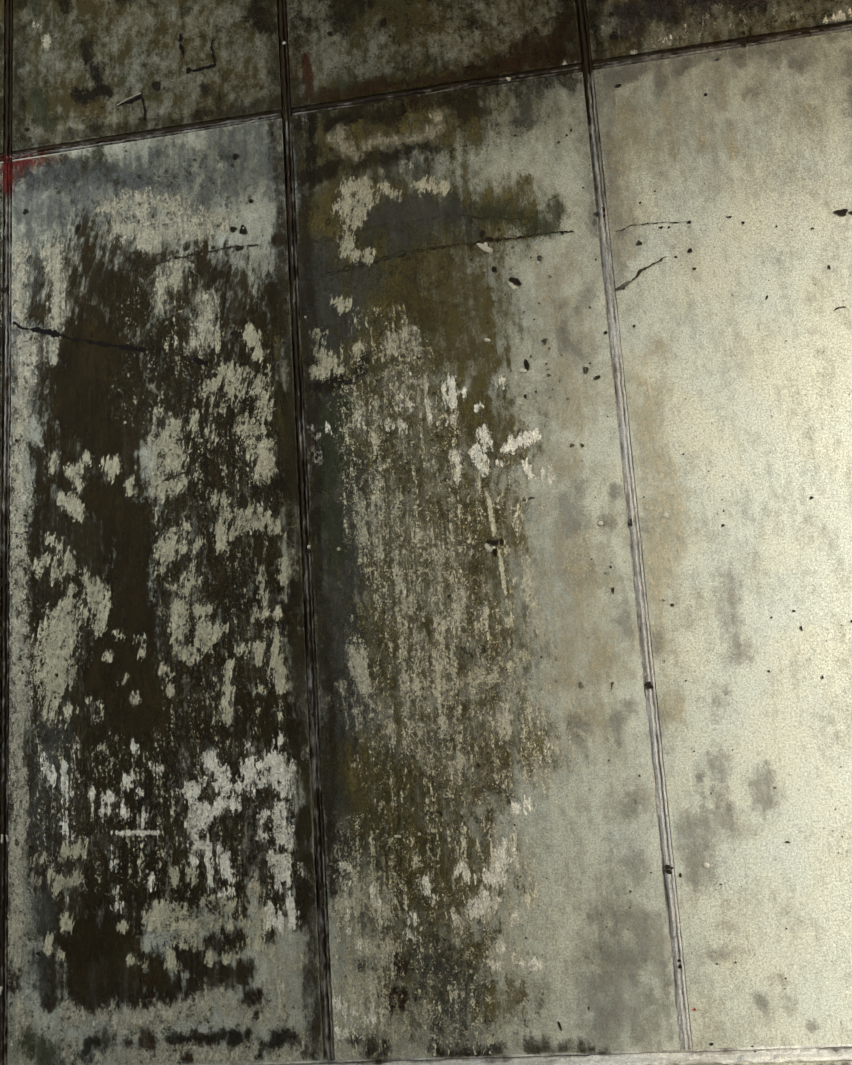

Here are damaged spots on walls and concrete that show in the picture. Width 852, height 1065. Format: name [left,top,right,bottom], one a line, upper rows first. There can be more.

water stain [588,0,847,74]
crack [304,214,574,280]
crack [615,256,666,290]
crack [615,221,690,232]
crack [13,321,149,352]
water stain [0,0,631,1065]
water stain [677,752,736,888]